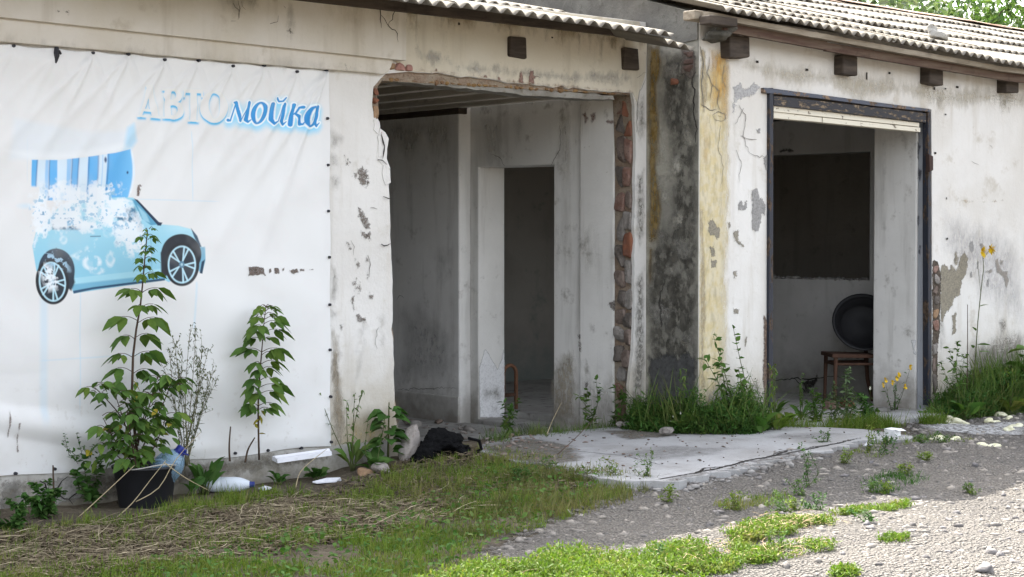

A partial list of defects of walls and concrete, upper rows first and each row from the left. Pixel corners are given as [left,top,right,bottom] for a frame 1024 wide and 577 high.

flaking render [372,88,391,185]
crack [691,47,765,186]
peeling [732,82,760,109]
flaking render [609,101,670,416]
damp [648,49,729,407]
peeling [738,188,765,231]
peeling [932,241,1009,394]
crack [555,438,857,479]